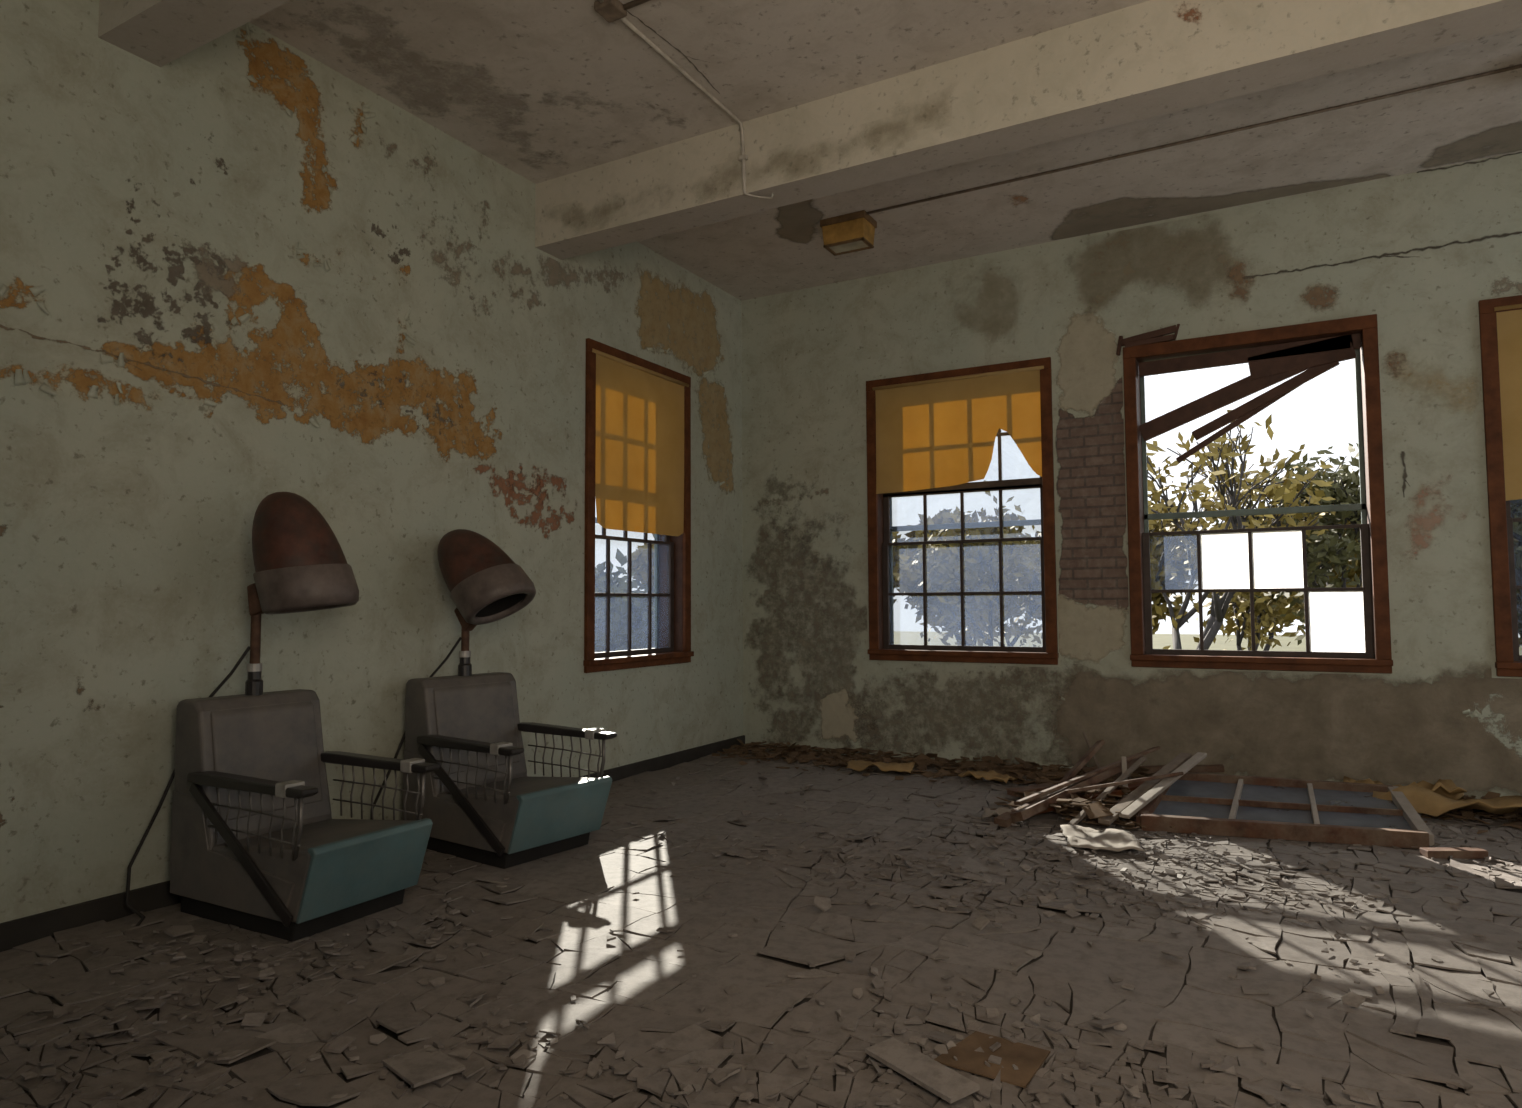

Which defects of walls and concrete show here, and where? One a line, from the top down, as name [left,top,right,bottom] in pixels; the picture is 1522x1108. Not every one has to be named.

peeling [235,24,338,212]
leakage [1421,121,1522,168]
peeling [0,177,502,462]
peeling [422,201,734,494]
flaking render [1116,324,1180,356]
leakage [1051,173,1391,309]
leakage [747,477,1082,765]